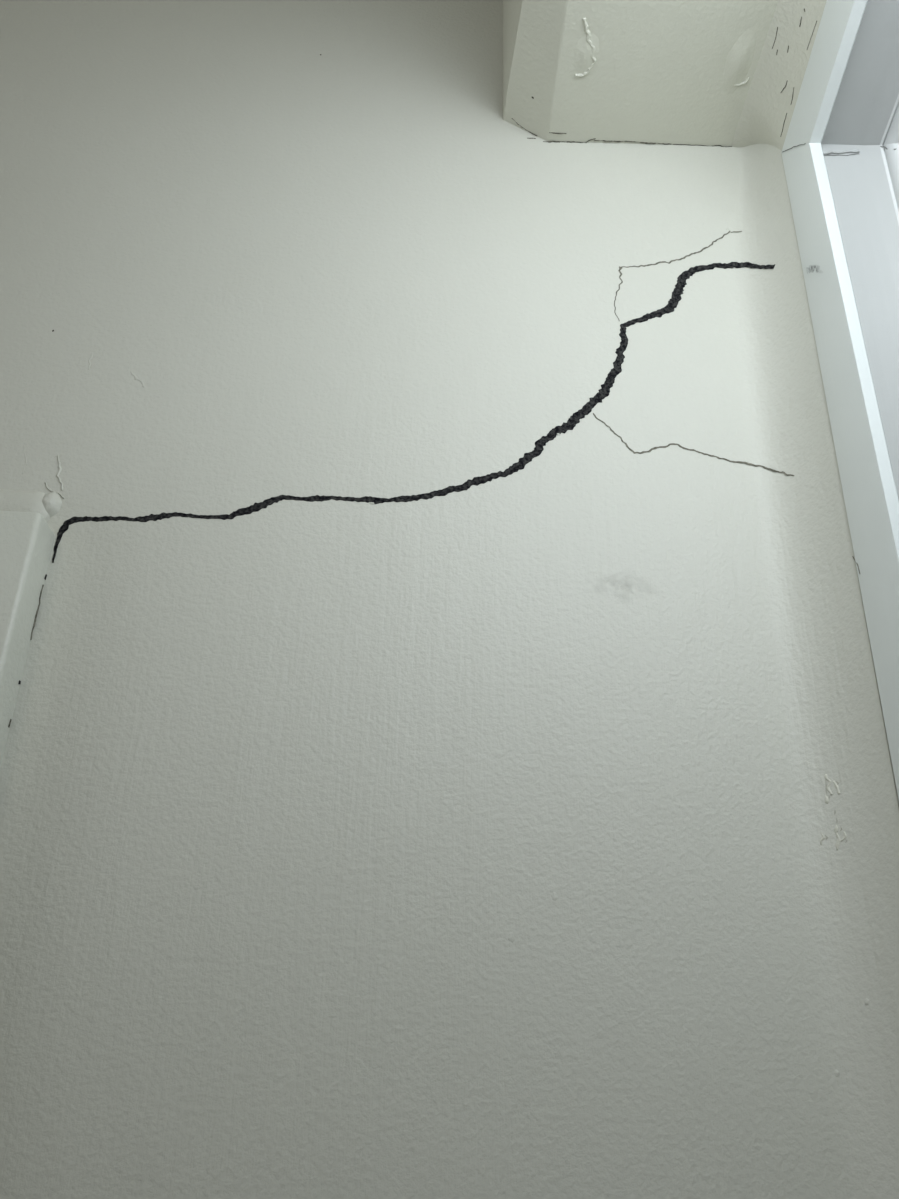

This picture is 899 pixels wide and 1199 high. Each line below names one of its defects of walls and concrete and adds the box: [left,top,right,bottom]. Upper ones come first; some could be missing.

crack [30,227,794,640]